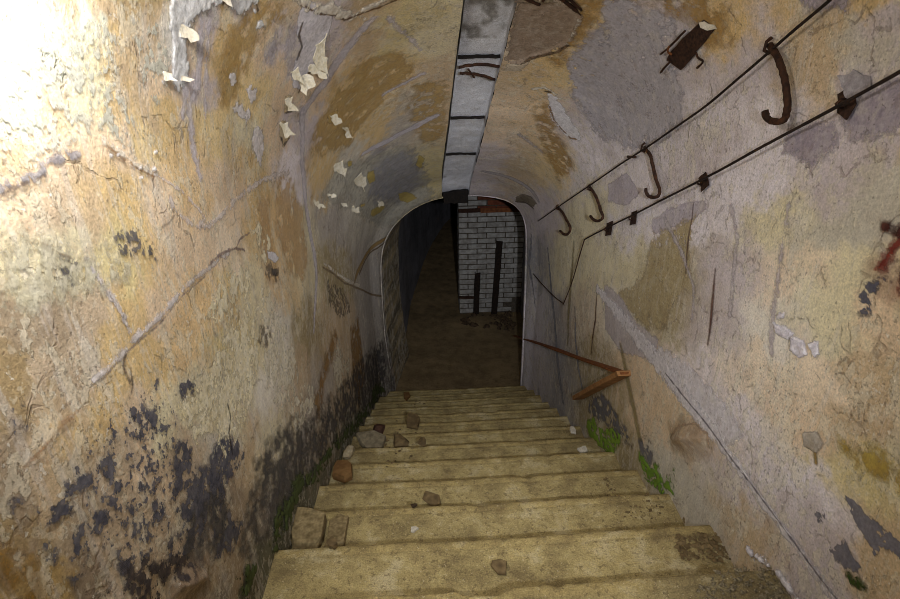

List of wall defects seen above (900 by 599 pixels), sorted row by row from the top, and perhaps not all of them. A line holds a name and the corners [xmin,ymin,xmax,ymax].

peeling [0,21,135,159]
peeling [134,0,264,92]
peeling [233,85,264,167]
peeling [279,2,332,147]
peeling [327,110,353,138]
crack [0,150,81,195]
crack [102,137,289,230]
crack [61,233,249,393]
leakage [37,16,439,599]
flaking render [829,539,861,572]
flaking render [845,496,900,559]